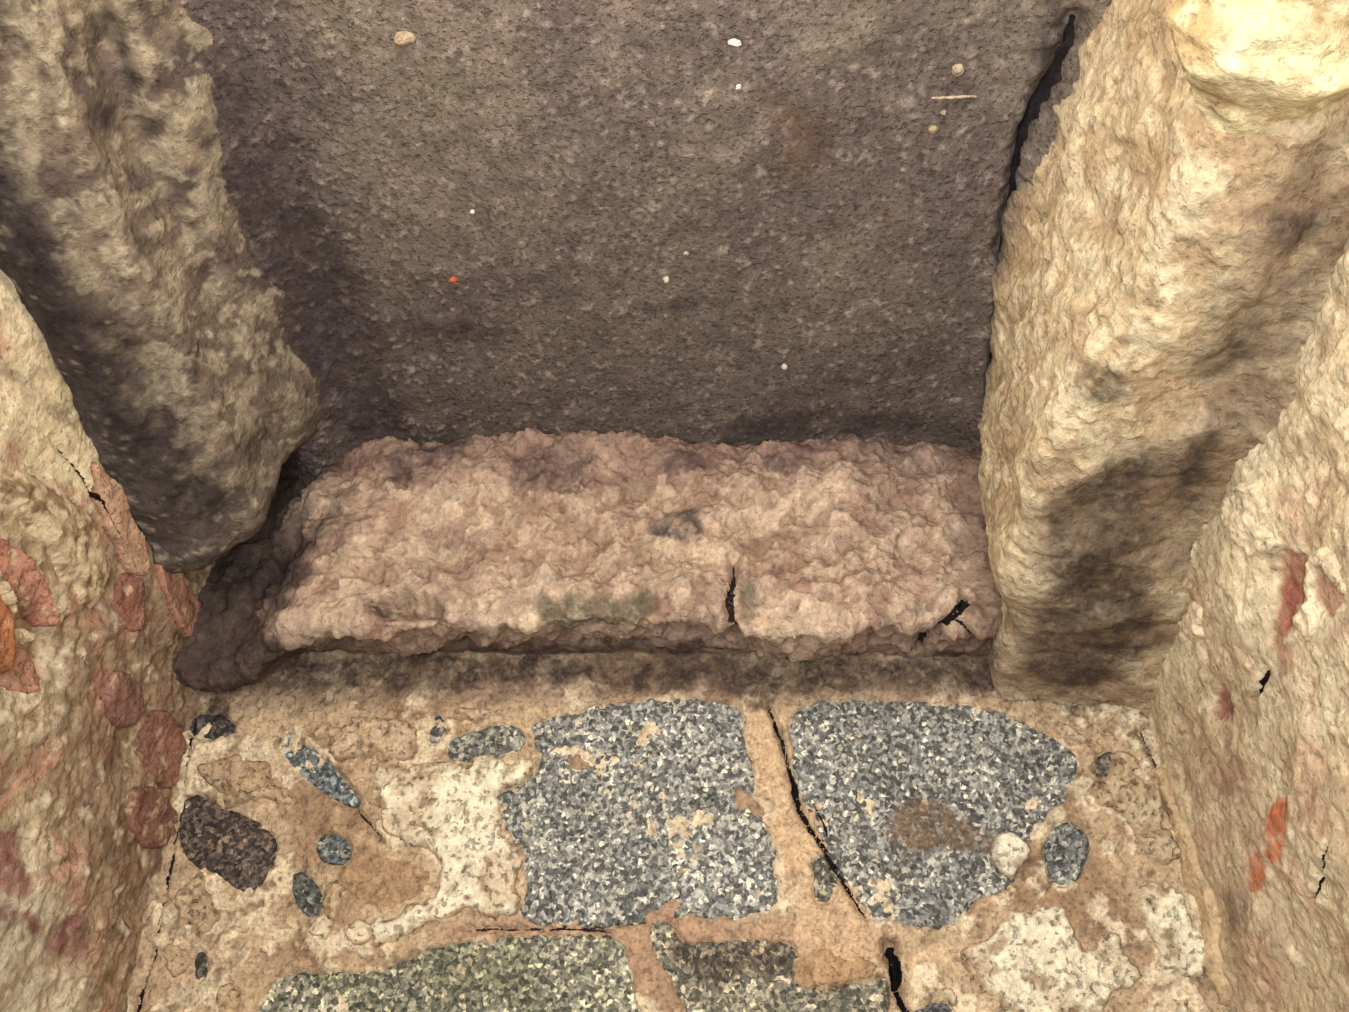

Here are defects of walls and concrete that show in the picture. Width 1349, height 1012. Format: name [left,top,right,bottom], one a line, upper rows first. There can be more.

crack [999,14,1075,252]
crack [725,567,738,624]
crack [768,709,866,918]
crack [884,947,910,1012]